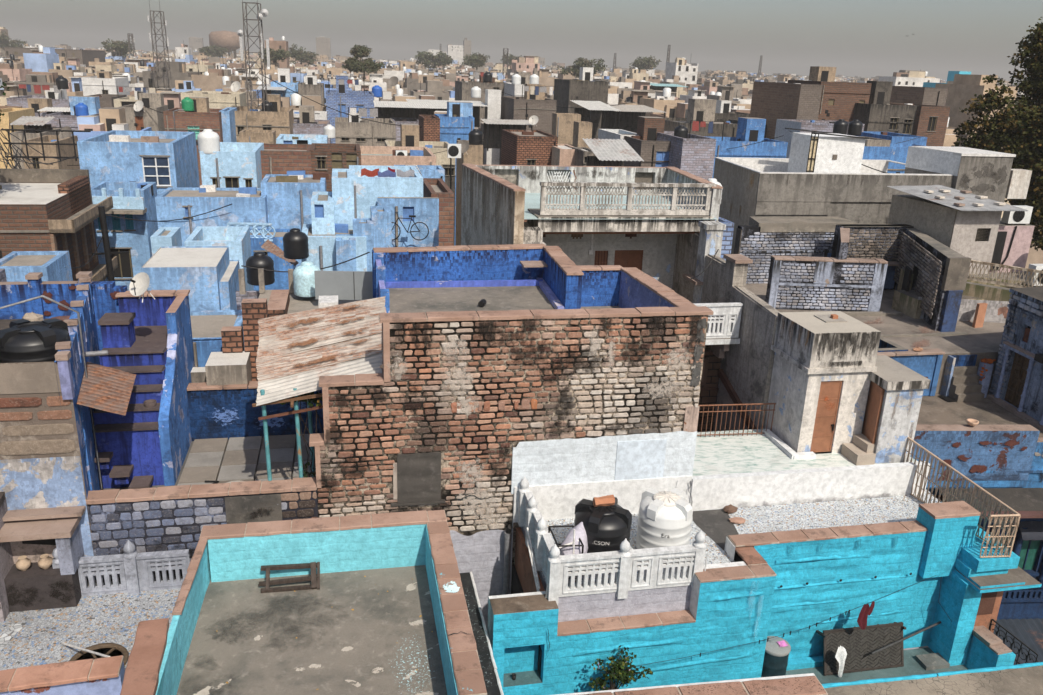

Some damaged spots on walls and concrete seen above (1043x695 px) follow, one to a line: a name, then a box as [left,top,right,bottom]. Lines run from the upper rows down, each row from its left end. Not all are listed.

water stain [336,394,354,410]
water stain [371,388,427,412]
water stain [394,323,433,349]
water stain [444,339,476,415]
water stain [478,316,664,436]
water stain [645,315,703,398]
water stain [817,320,881,367]
water stain [321,423,371,490]
peeling [941,442,987,473]
peeling [979,440,1028,451]
water stain [392,446,511,525]